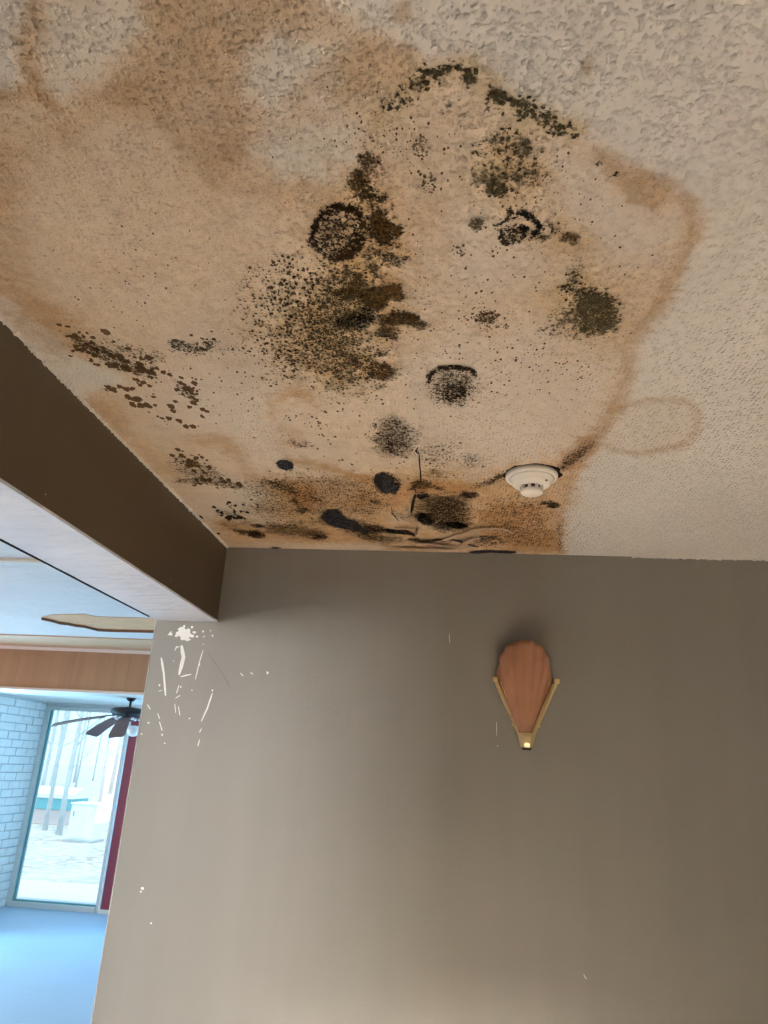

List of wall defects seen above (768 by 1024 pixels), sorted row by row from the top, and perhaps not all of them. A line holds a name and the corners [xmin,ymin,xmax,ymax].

damp [0,0,721,555]
peeling [168,625,213,645]